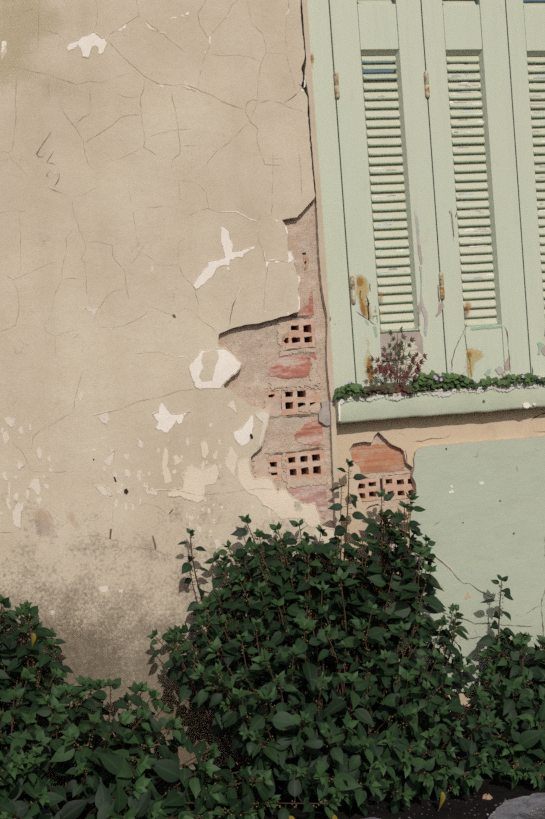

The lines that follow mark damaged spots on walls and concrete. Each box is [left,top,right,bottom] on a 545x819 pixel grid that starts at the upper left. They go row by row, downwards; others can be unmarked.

peeling [66,30,108,59]
crack [287,1,306,101]
peeling [192,226,256,290]
rust [357,276,370,316]
peeling [188,347,242,391]
rust [467,350,481,374]
peeling [0,447,53,529]
peeling [95,400,335,549]
crack [430,553,493,598]
crack [442,591,545,643]